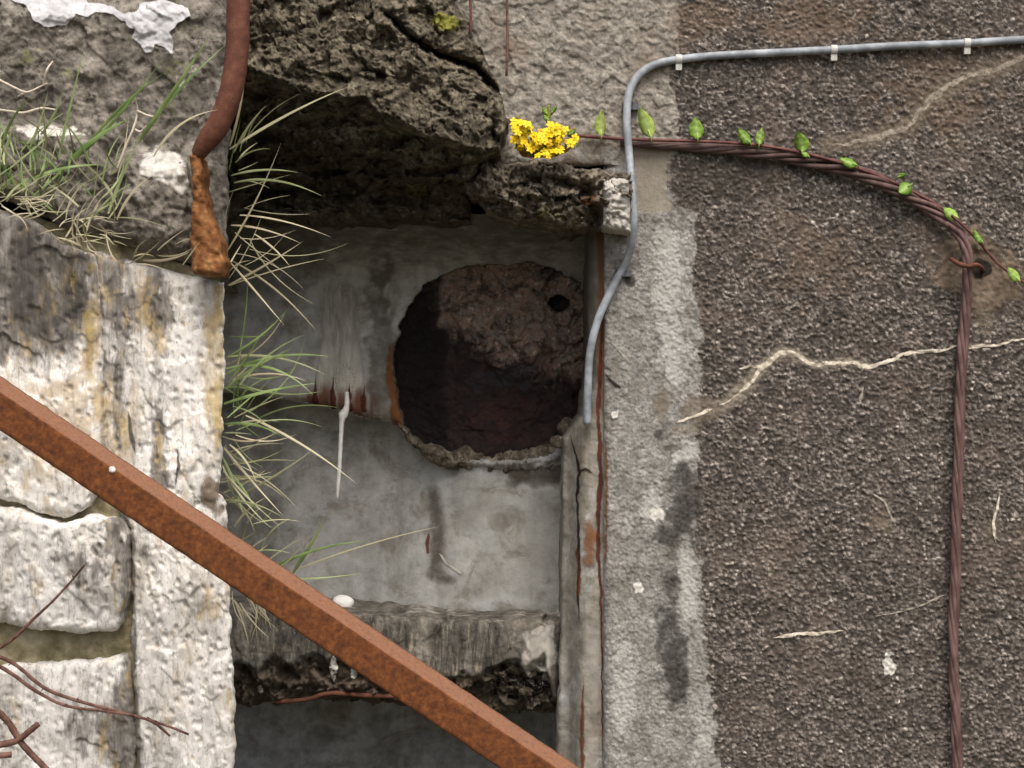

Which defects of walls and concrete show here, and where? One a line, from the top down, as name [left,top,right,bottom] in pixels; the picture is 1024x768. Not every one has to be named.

crack [829,55,1024,147]
rust [306,374,373,420]
rust [386,357,403,426]
crack [676,338,1024,423]
crack [570,435,593,619]
rust [583,322,608,762]
water stain [655,461,701,550]
water stain [655,574,689,705]